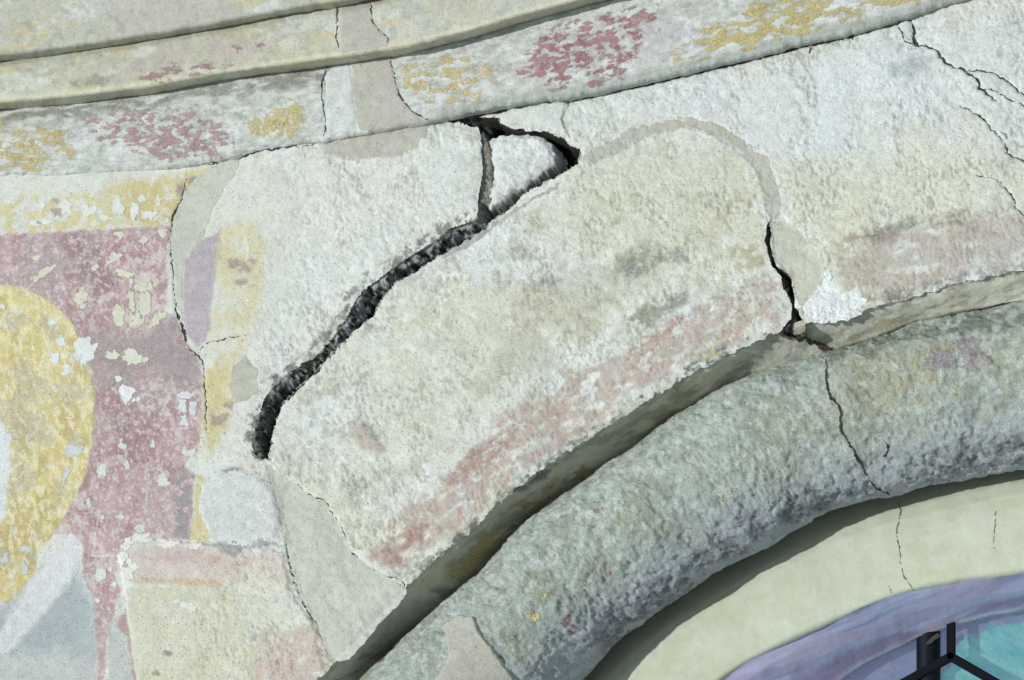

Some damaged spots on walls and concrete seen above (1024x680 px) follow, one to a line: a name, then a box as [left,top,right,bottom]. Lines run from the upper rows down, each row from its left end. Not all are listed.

peeling [401,56,496,104]
crack [567,20,1024,162]
peeling [446,6,656,257]
peeling [30,195,169,247]
crack [245,3,580,461]
peeling [91,252,166,330]
crack [170,179,238,420]
spalling [803,269,867,324]
peeling [47,319,149,375]
peeling [115,375,141,405]
crack [765,221,913,591]
peeling [95,524,204,587]